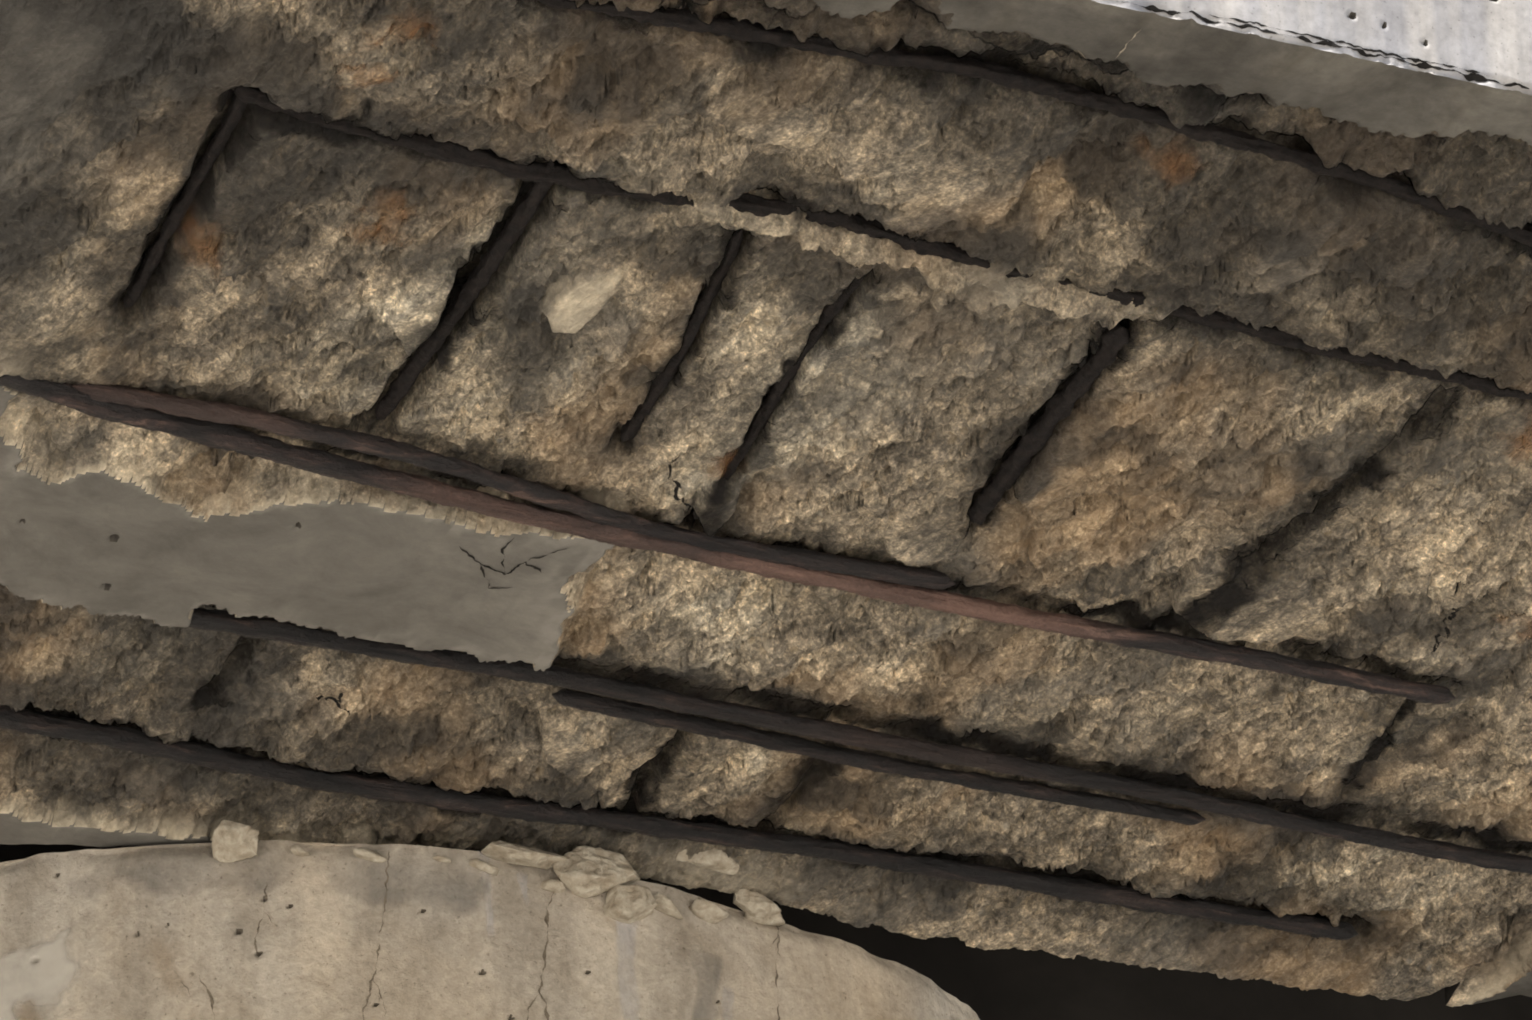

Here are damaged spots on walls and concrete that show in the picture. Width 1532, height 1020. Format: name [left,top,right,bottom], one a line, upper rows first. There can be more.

spalling [539,0,1532,247]
spalling [389,264,453,356]
spalling [543,270,625,333]
corrosion [648,304,846,537]
spalling [0,375,1456,704]
corrosion [1054,456,1392,634]
corrosion [438,730,784,834]
spalling [0,584,1532,1020]
corrosion [740,686,1419,821]
corrosion [1410,822,1532,853]
crack [172,969,215,1016]
crack [362,852,390,1020]